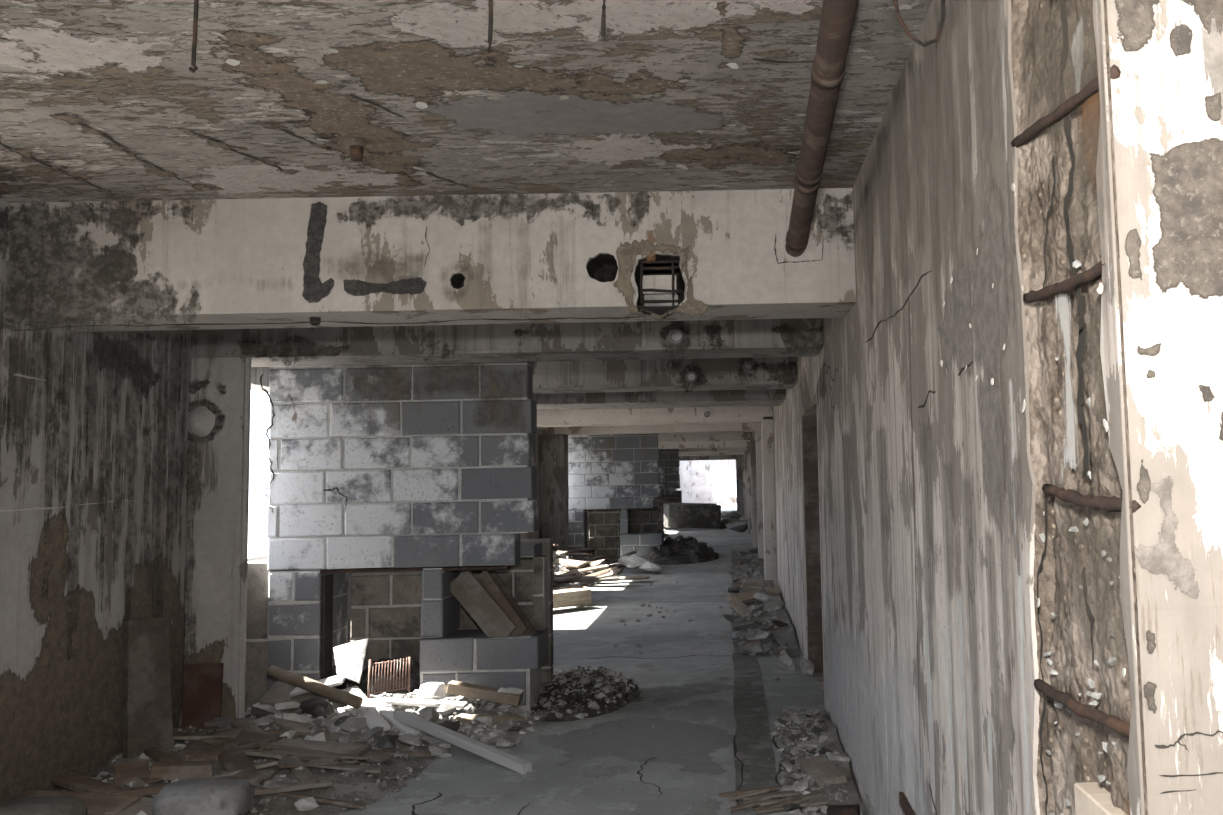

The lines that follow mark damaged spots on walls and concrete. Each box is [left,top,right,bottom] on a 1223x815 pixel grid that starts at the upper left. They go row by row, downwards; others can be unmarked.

peeling [0,18,191,80]
peeling [187,0,823,195]
peeling [613,239,709,319]
spalling [939,0,1223,815]
water stain [0,200,226,707]
corrosion [1042,484,1142,513]
peeling [28,503,71,627]
corrosion [1034,679,1130,737]
crack [411,793,443,815]
crack [637,757,662,797]